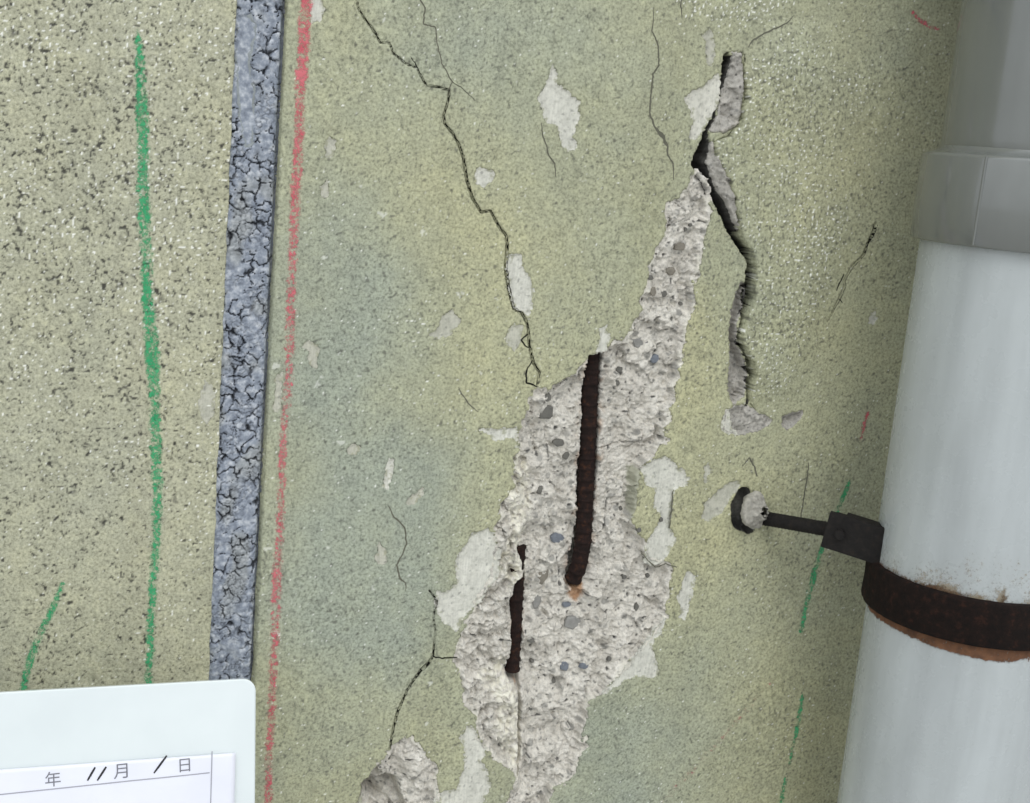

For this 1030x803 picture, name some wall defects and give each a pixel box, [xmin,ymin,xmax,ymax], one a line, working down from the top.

crack [358,0,541,387]
crack [649,8,793,406]
spalling [357,28,744,803]
crack [388,506,457,746]